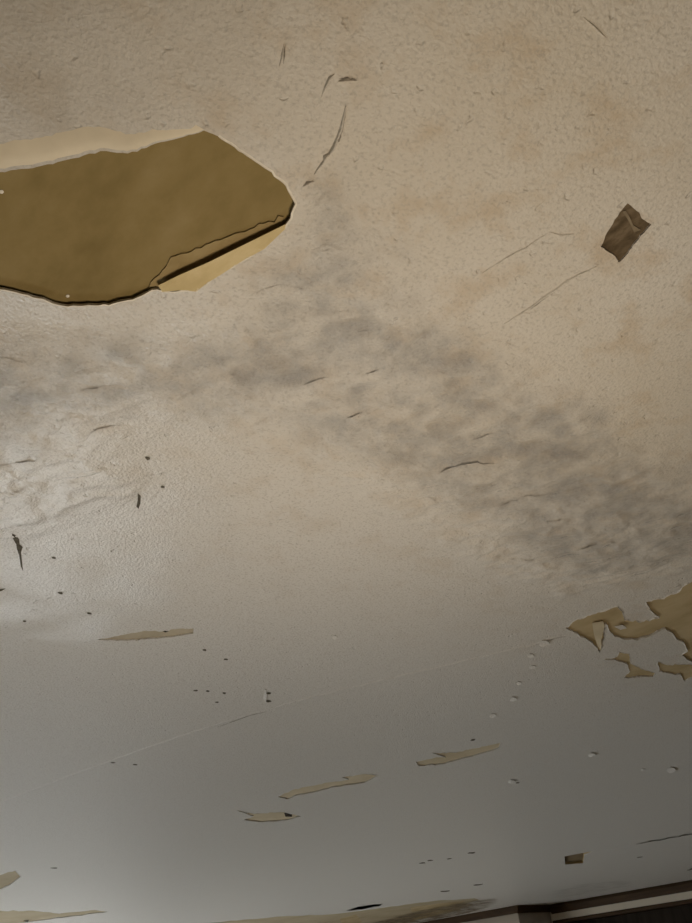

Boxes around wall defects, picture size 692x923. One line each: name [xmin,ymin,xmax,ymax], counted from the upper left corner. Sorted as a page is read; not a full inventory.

crack [321,74,357,98]
crack [303,106,346,187]
spalling [0,125,297,308]
crack [481,232,574,274]
spalling [602,203,649,261]
crack [504,265,598,324]
peeling [97,628,194,641]
peeling [565,581,692,681]
peeling [415,739,502,766]
peeling [0,870,22,890]
peeling [0,910,109,923]
peeling [209,890,481,923]